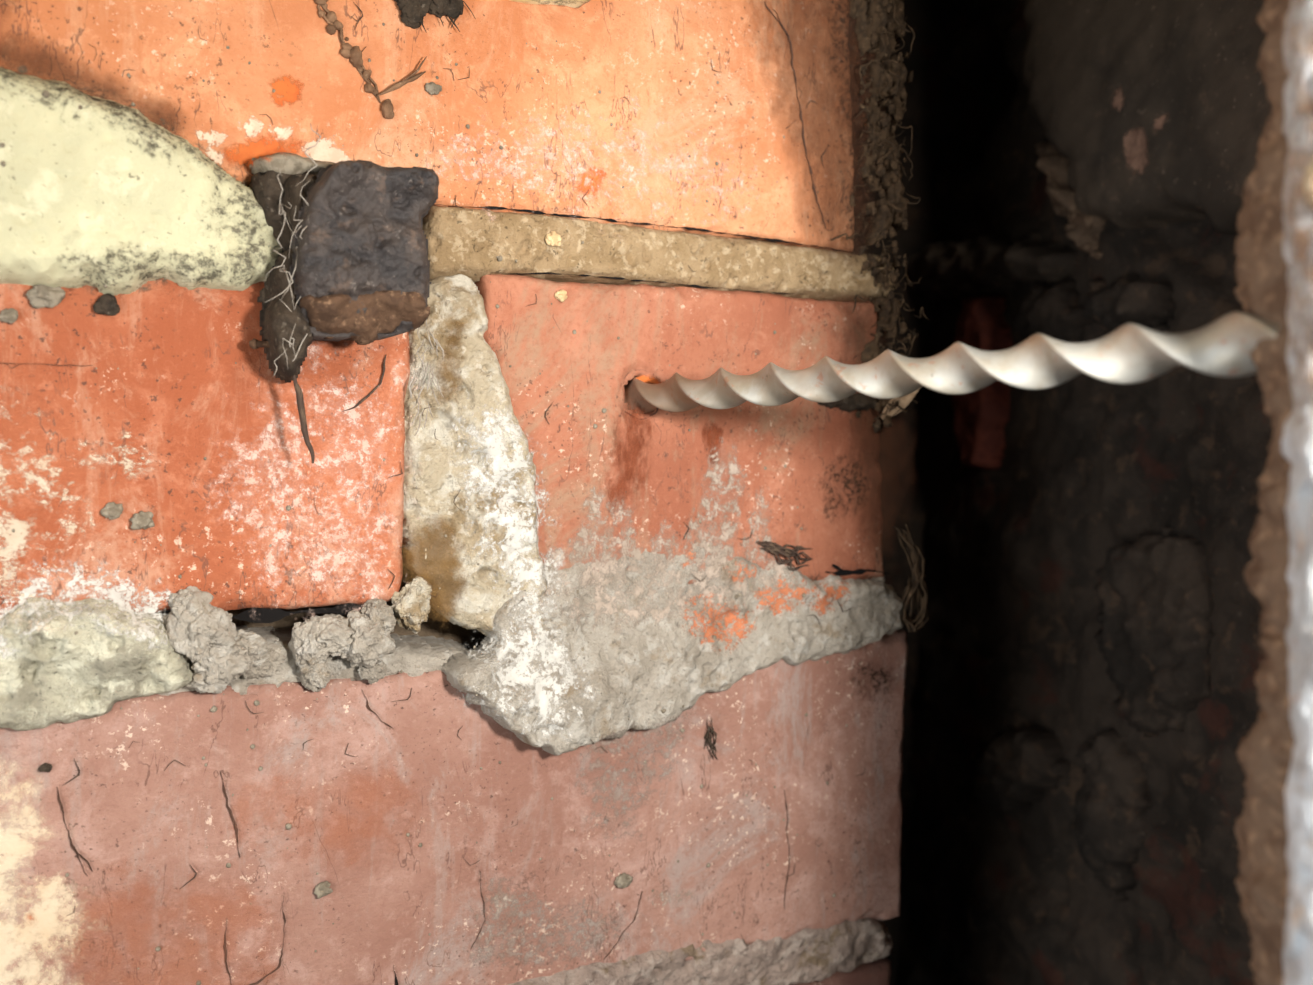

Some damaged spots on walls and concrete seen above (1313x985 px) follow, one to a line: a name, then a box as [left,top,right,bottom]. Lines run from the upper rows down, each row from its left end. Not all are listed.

crack [437,2,853,253]
corrosion [257,174,430,383]
damp [0,447,170,658]
damp [81,435,149,475]
damp [220,376,397,609]
crack [57,787,93,875]
crack [220,771,240,857]
crack [224,900,286,985]